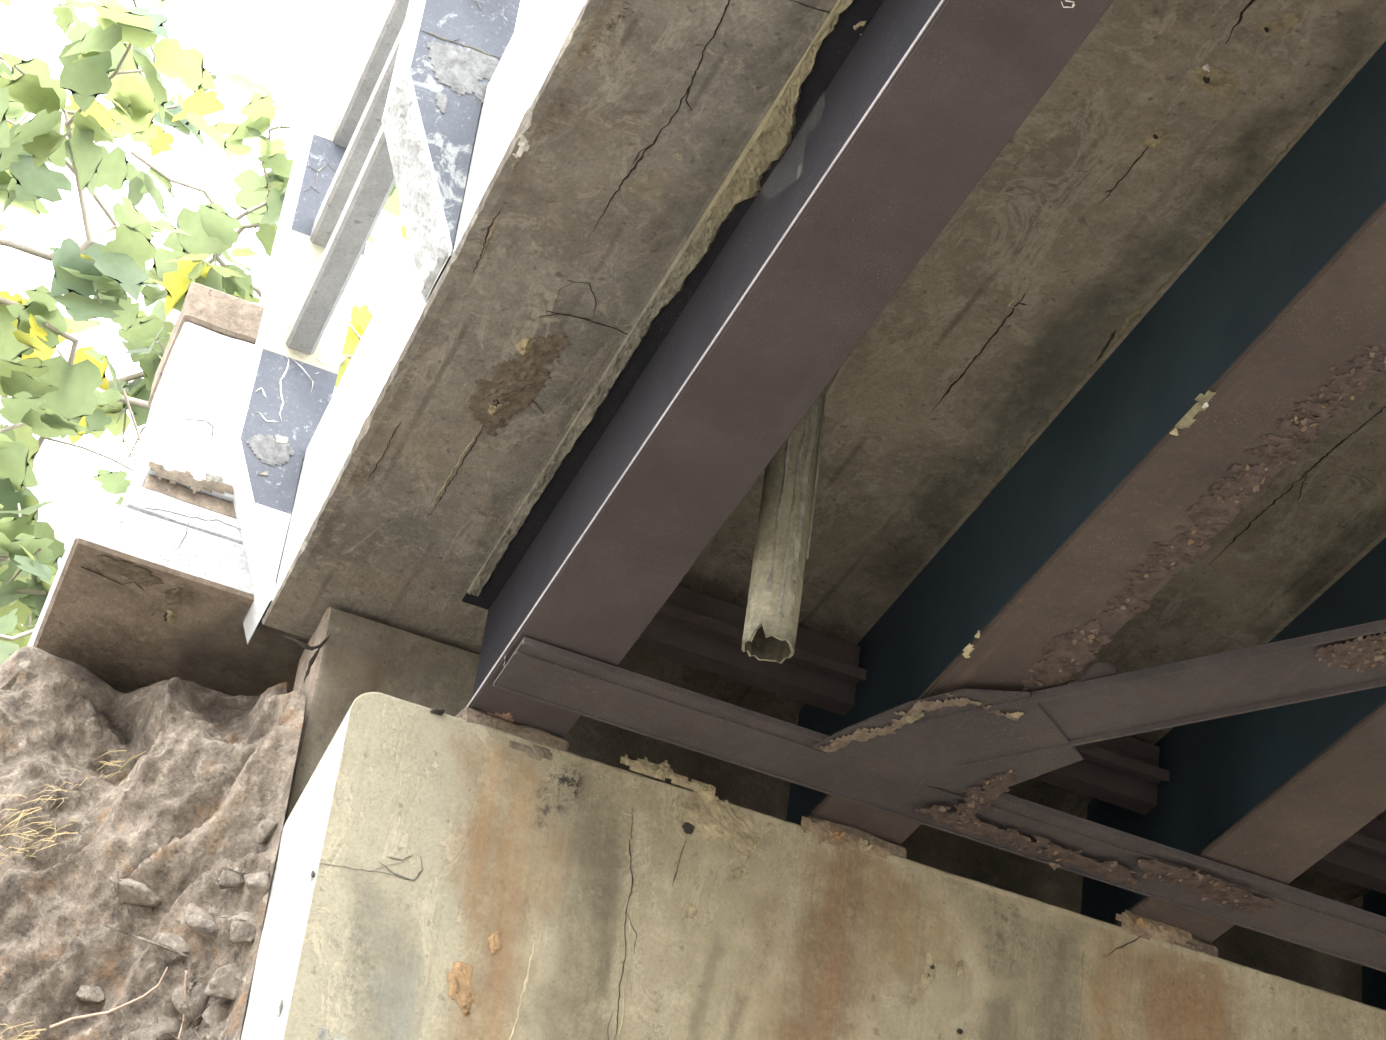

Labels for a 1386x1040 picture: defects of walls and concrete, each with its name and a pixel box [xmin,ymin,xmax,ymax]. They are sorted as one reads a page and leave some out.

crack [790,0,830,14]
crack [588,0,730,238]
crack [534,280,628,344]
peeling [148,461,234,494]
crack [427,418,487,518]
crack [672,839,687,886]
spalling [620,754,760,881]
crack [608,809,637,1040]